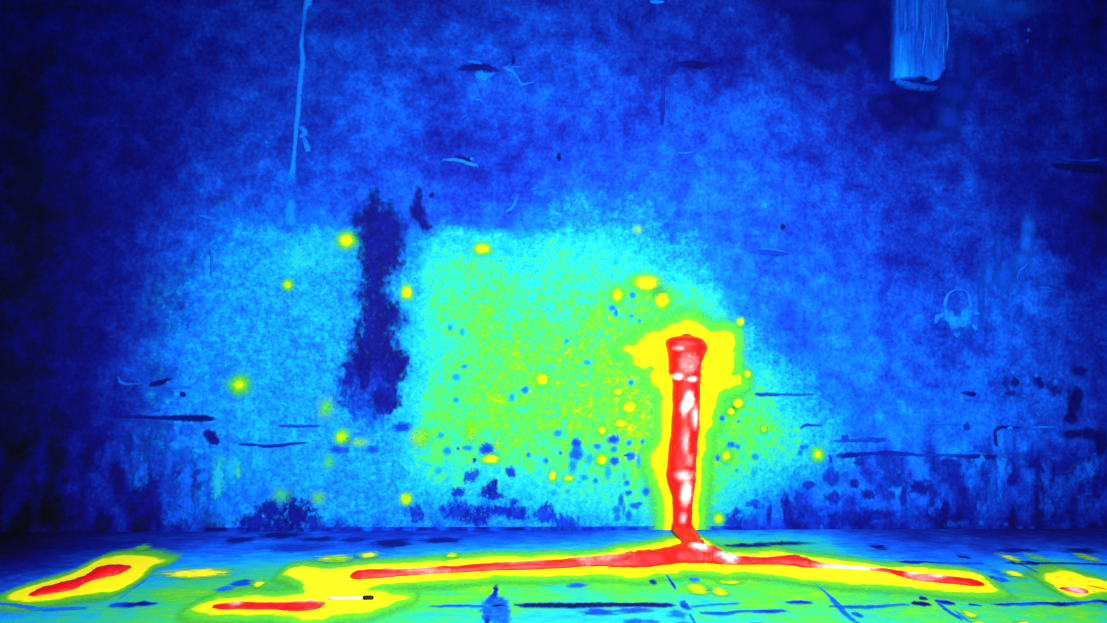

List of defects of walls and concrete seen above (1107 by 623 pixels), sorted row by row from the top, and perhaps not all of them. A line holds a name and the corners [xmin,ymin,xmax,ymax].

leakage [150,188,1014,623]
crack [0,564,159,611]
crack [212,600,325,611]
crack [430,574,1107,623]
crack [896,560,1107,573]